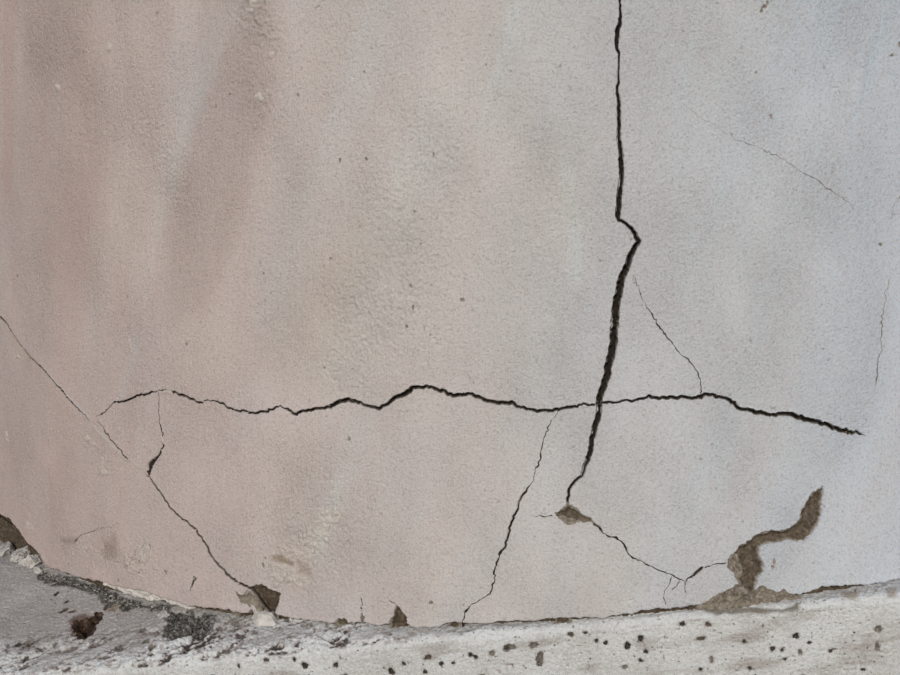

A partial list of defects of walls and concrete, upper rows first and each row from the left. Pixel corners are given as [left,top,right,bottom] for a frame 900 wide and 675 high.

crack [0,316,90,422]
crack [96,0,866,627]
spalling [0,514,40,555]
peeling [37,507,346,641]
spalling [494,617,608,645]
spalling [609,487,861,617]